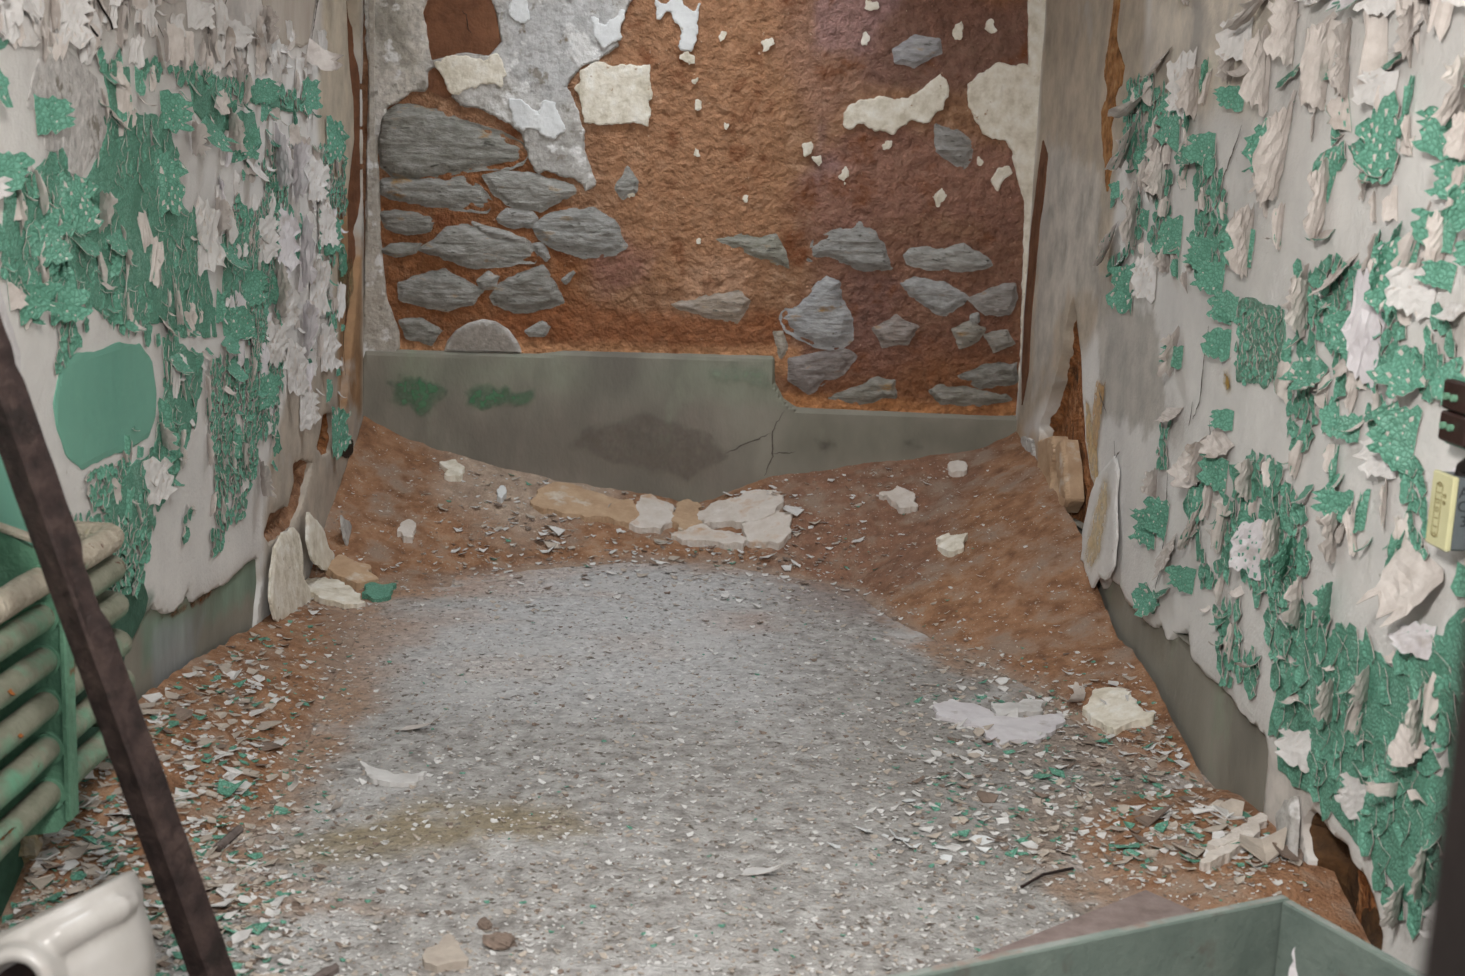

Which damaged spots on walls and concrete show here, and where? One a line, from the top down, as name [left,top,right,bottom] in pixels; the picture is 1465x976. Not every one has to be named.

peeling [0,0,361,622]
crack [725,413,792,473]
peeling [1049,0,1465,950]
peeling [1288,948,1298,976]